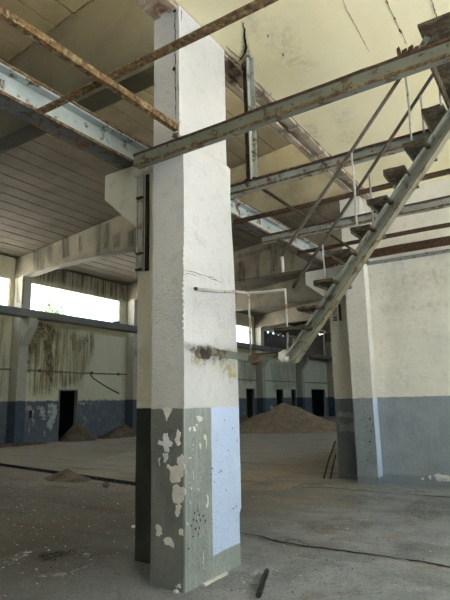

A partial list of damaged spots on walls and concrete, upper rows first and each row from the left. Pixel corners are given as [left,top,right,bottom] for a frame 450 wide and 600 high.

crack [227,23,247,61]
corrosion [0,0,450,167]
water stain [30,329,92,393]
peeling [25,403,57,436]
peeling [158,429,199,517]
spalling [421,474,450,482]
peeling [156,524,174,548]
crack [240,532,450,568]